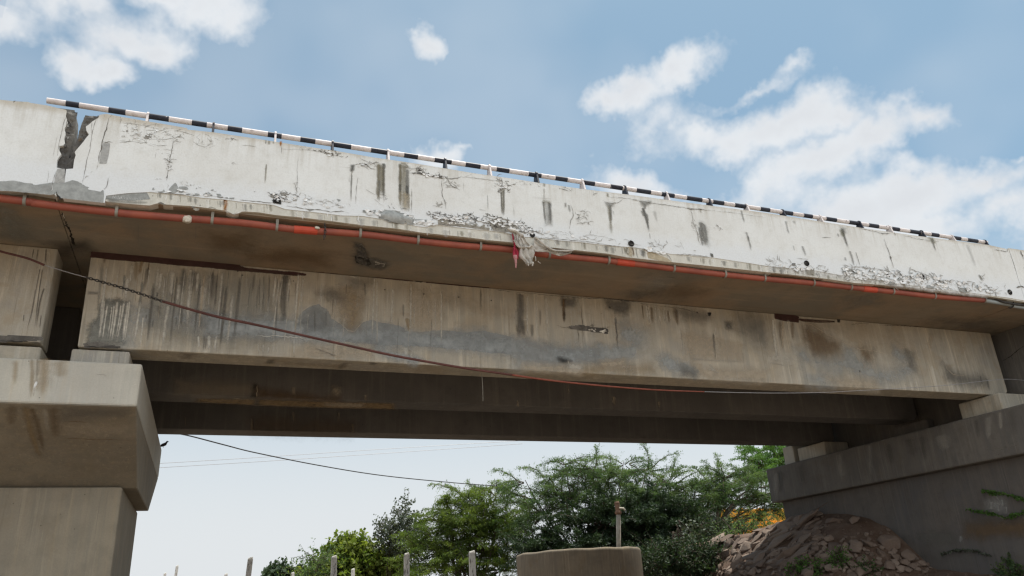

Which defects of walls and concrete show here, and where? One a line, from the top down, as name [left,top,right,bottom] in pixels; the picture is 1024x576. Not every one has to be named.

spalling [57,111,99,172]
leakage [351,162,412,213]
peeling [426,209,714,261]
peeling [766,254,1006,296]
leakage [89,264,643,373]
spalling [558,324,609,341]